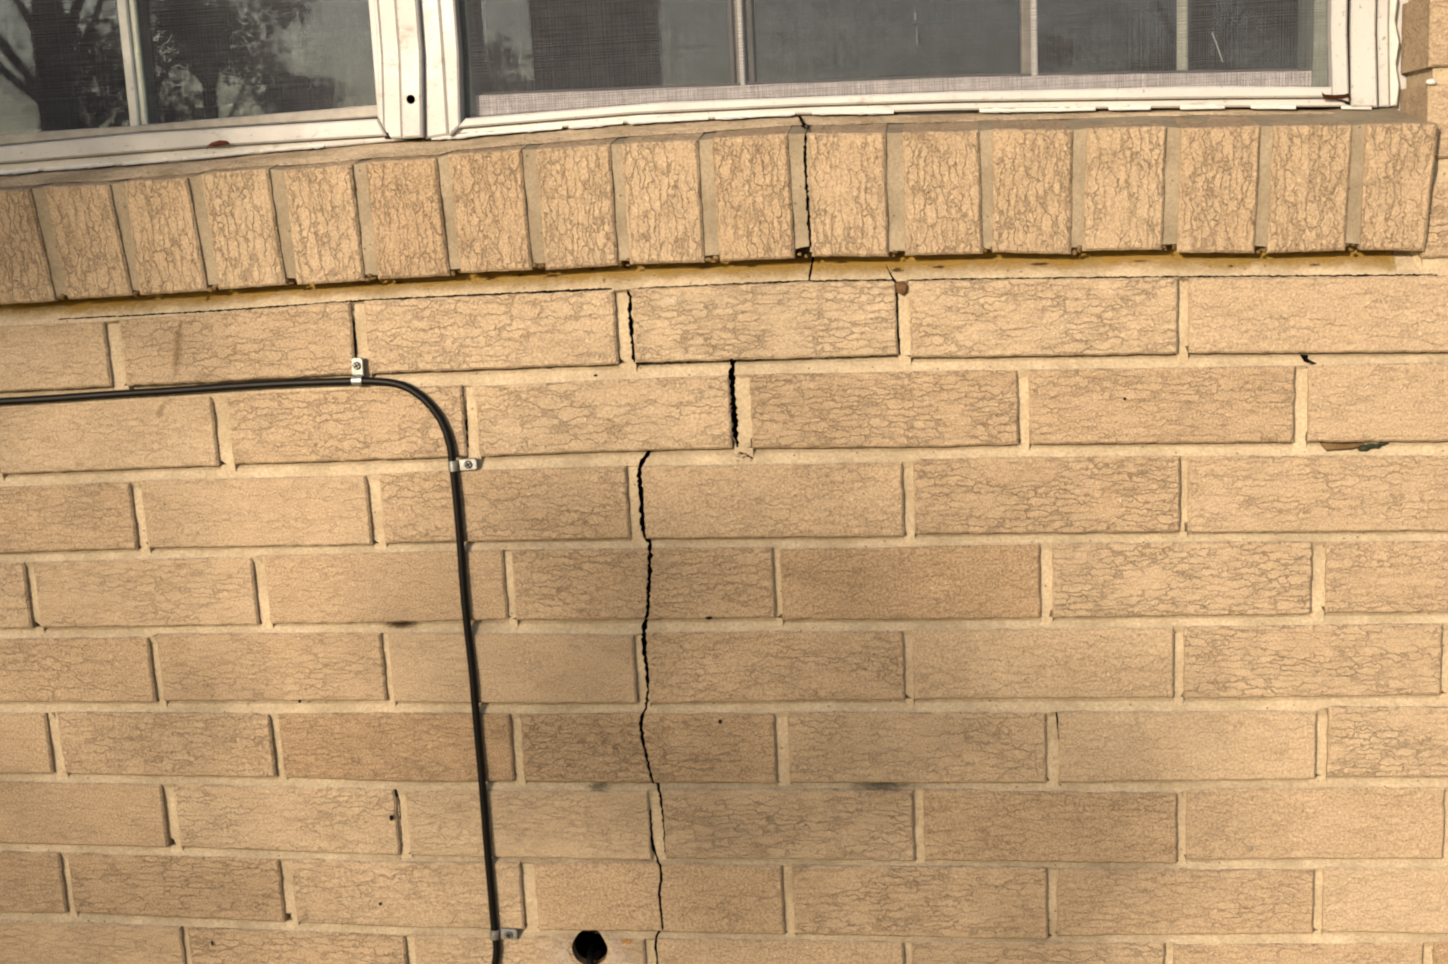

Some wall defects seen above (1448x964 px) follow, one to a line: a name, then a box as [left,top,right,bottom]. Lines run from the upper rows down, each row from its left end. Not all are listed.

crack [637,450,666,964]